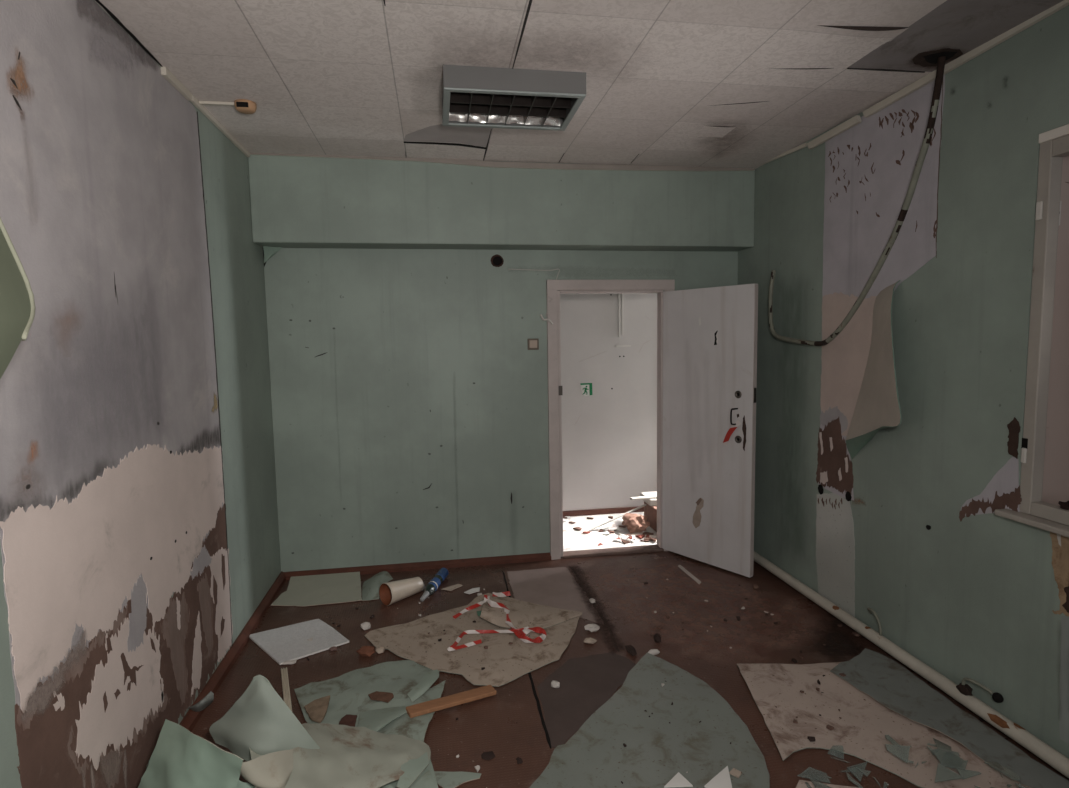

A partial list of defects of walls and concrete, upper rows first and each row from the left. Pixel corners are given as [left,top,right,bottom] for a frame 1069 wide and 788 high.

flaking render [911,48,963,68]
peeling [879,109,919,137]
crack [404,129,492,161]
peeling [828,143,875,214]
damp [182,430,220,453]
peeling [818,484,852,509]
flaking render [1050,532,1069,617]